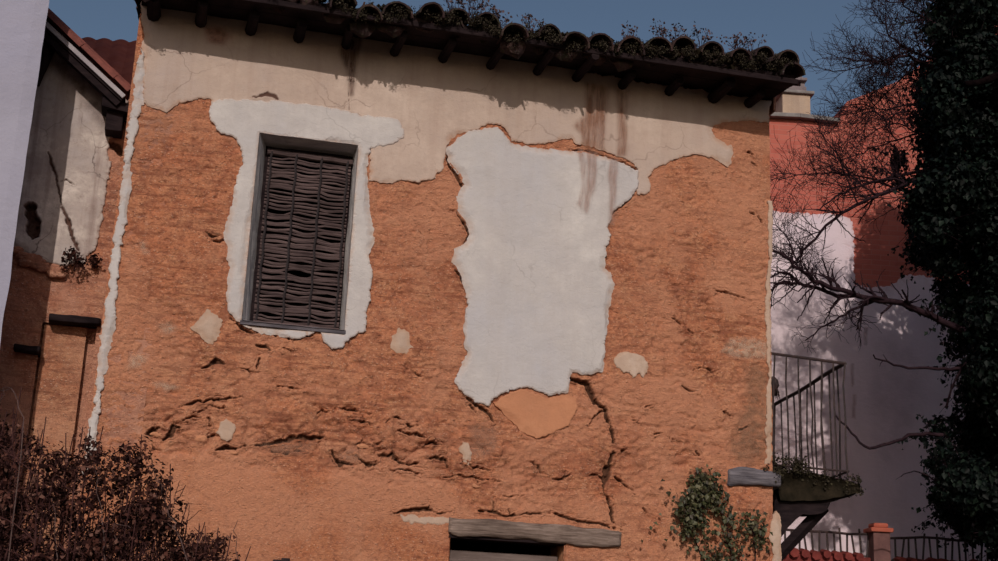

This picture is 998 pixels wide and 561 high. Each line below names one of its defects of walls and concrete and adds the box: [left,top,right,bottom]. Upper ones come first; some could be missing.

crack [45,149,85,263]
peeling [14,1,773,488]
crack [198,353,229,371]
crack [402,364,425,380]
crack [390,374,638,534]